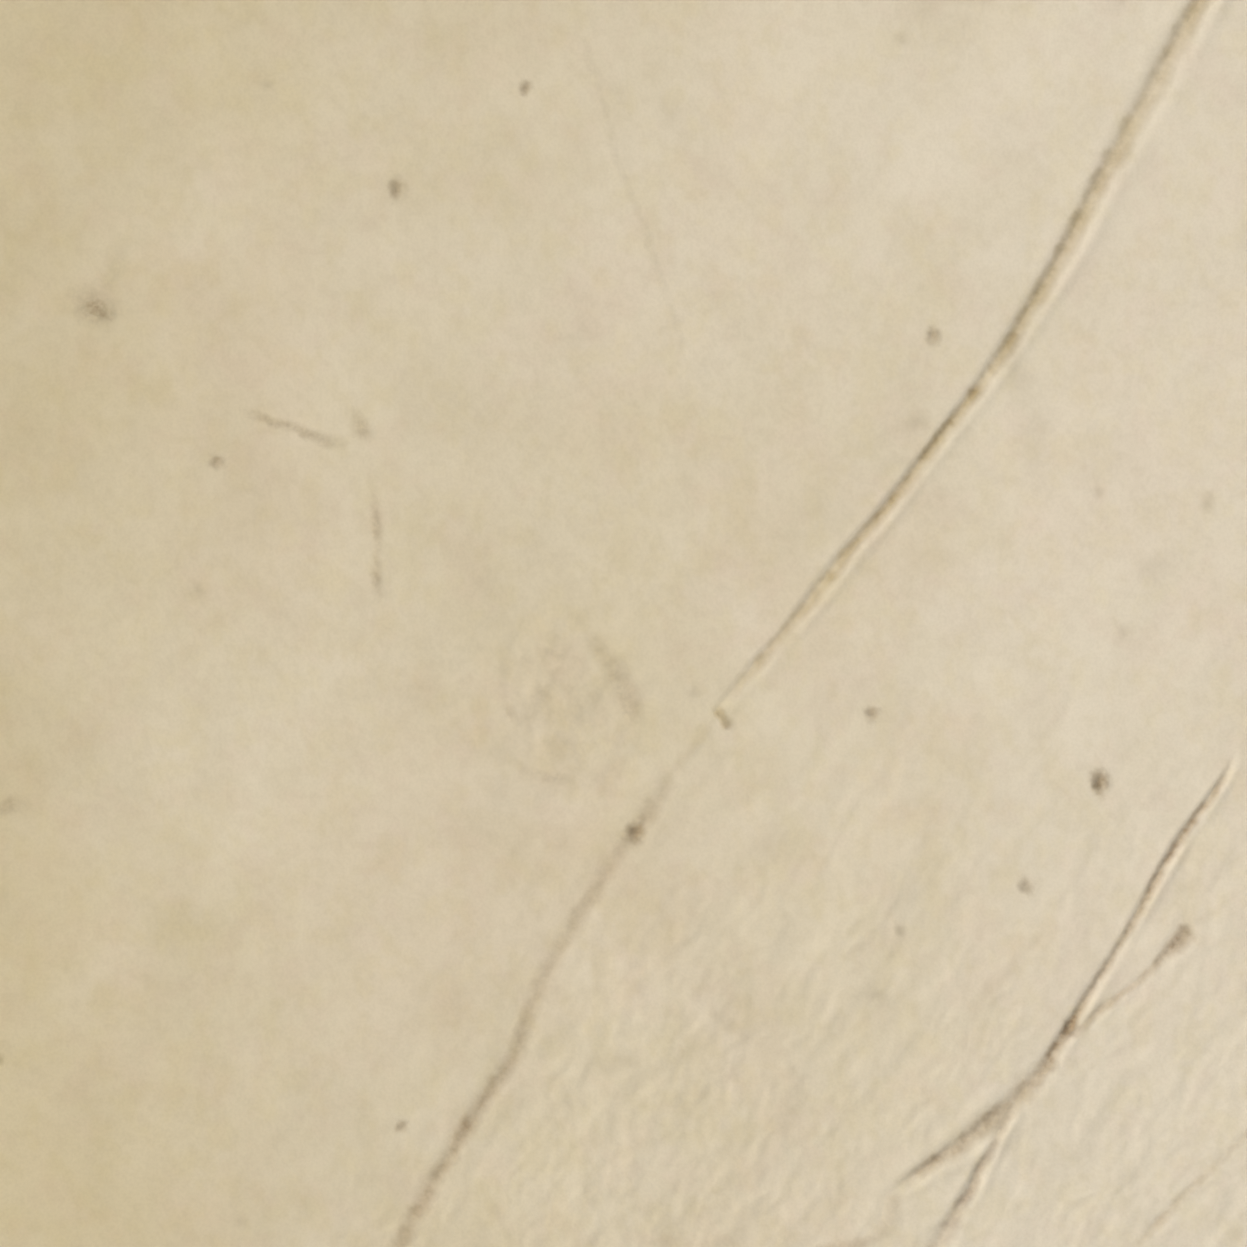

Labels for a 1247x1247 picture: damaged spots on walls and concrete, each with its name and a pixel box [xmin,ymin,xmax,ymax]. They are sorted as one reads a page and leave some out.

crack [1047,1014,1076,1057]